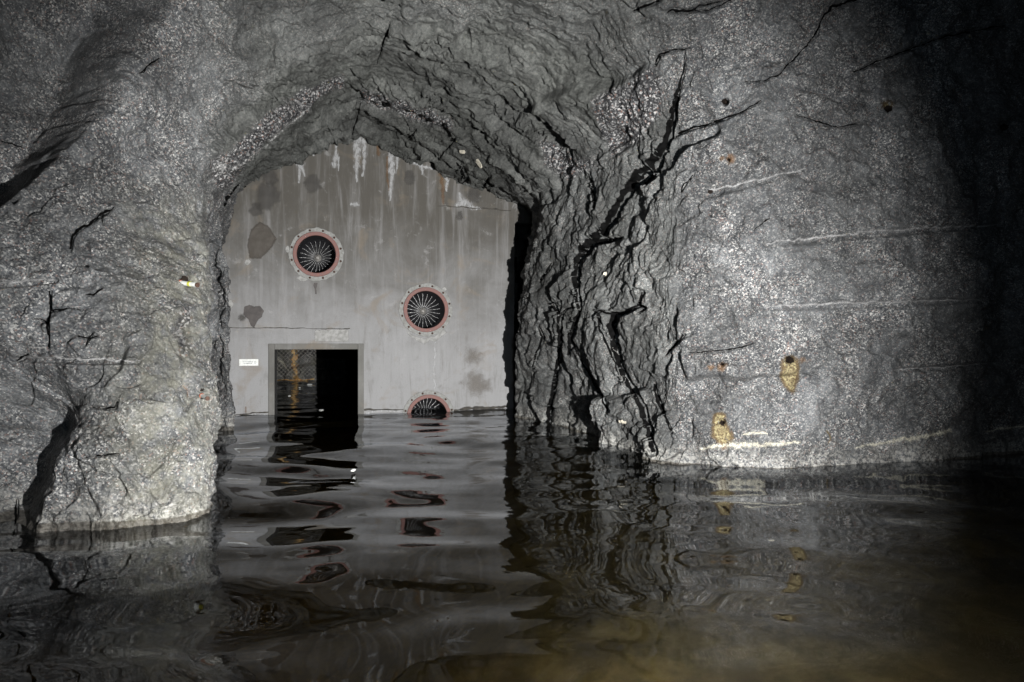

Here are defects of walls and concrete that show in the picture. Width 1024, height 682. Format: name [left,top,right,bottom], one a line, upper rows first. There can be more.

damp [297,154,320,192]
efflorescence [353,138,367,182]
damp [388,152,480,219]
crack [69,207,114,249]
crack [532,0,858,453]
damp [239,305,264,328]
rust [780,356,800,393]
rust [712,413,734,445]